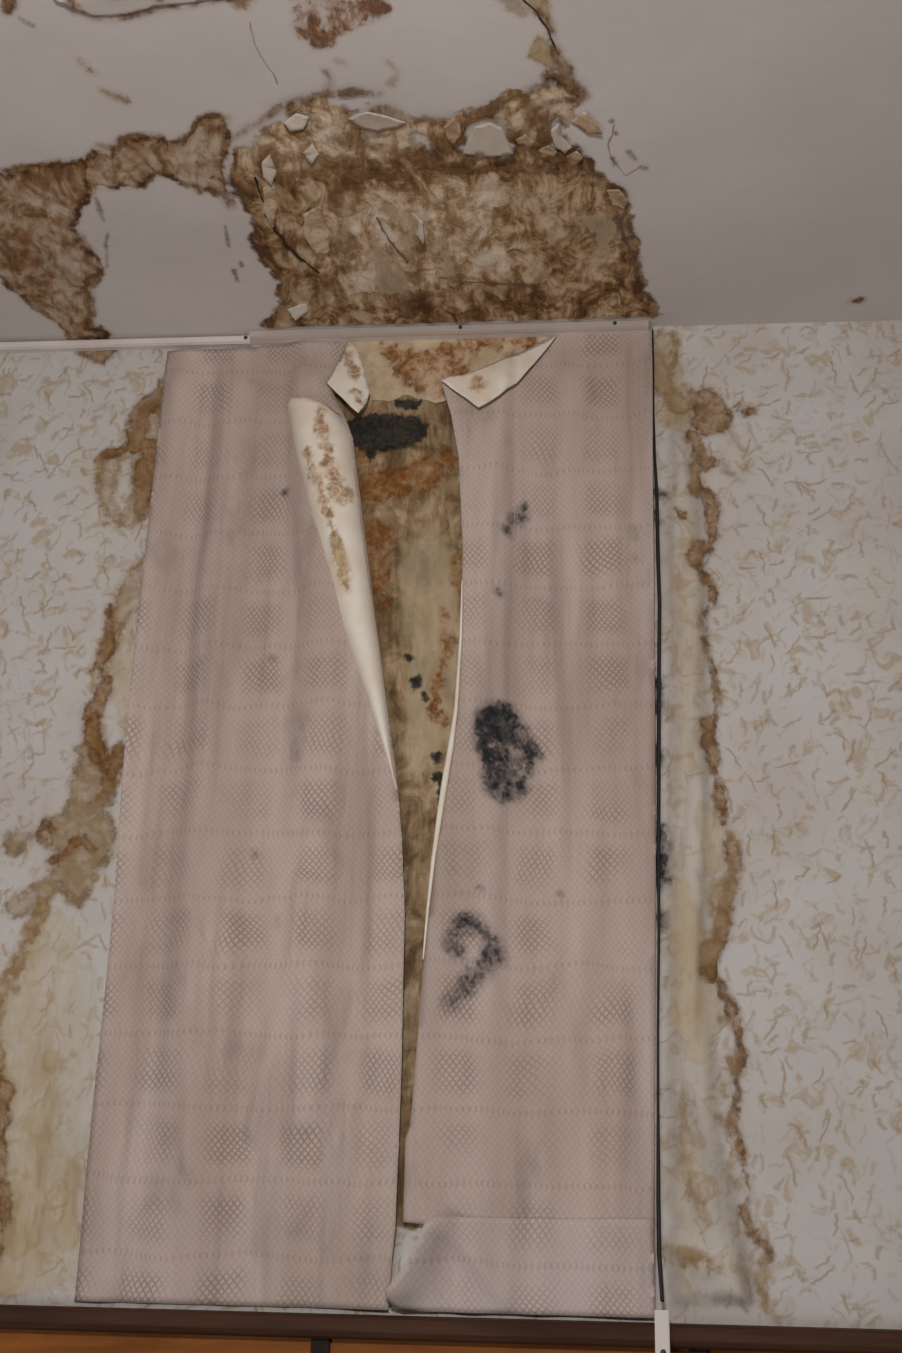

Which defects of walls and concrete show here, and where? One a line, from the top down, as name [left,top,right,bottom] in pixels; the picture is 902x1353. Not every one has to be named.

spalling [55,0,229,20]
crack [522,0,559,55]
flaking render [228,70,659,328]
damp [94,379,163,527]
damp [347,399,430,461]
damp [0,559,144,1019]
damp [475,701,539,801]
damp [652,330,755,1165]
damp [451,914,501,1003]
damp [0,1043,37,1290]
damp [738,1199,773,1262]